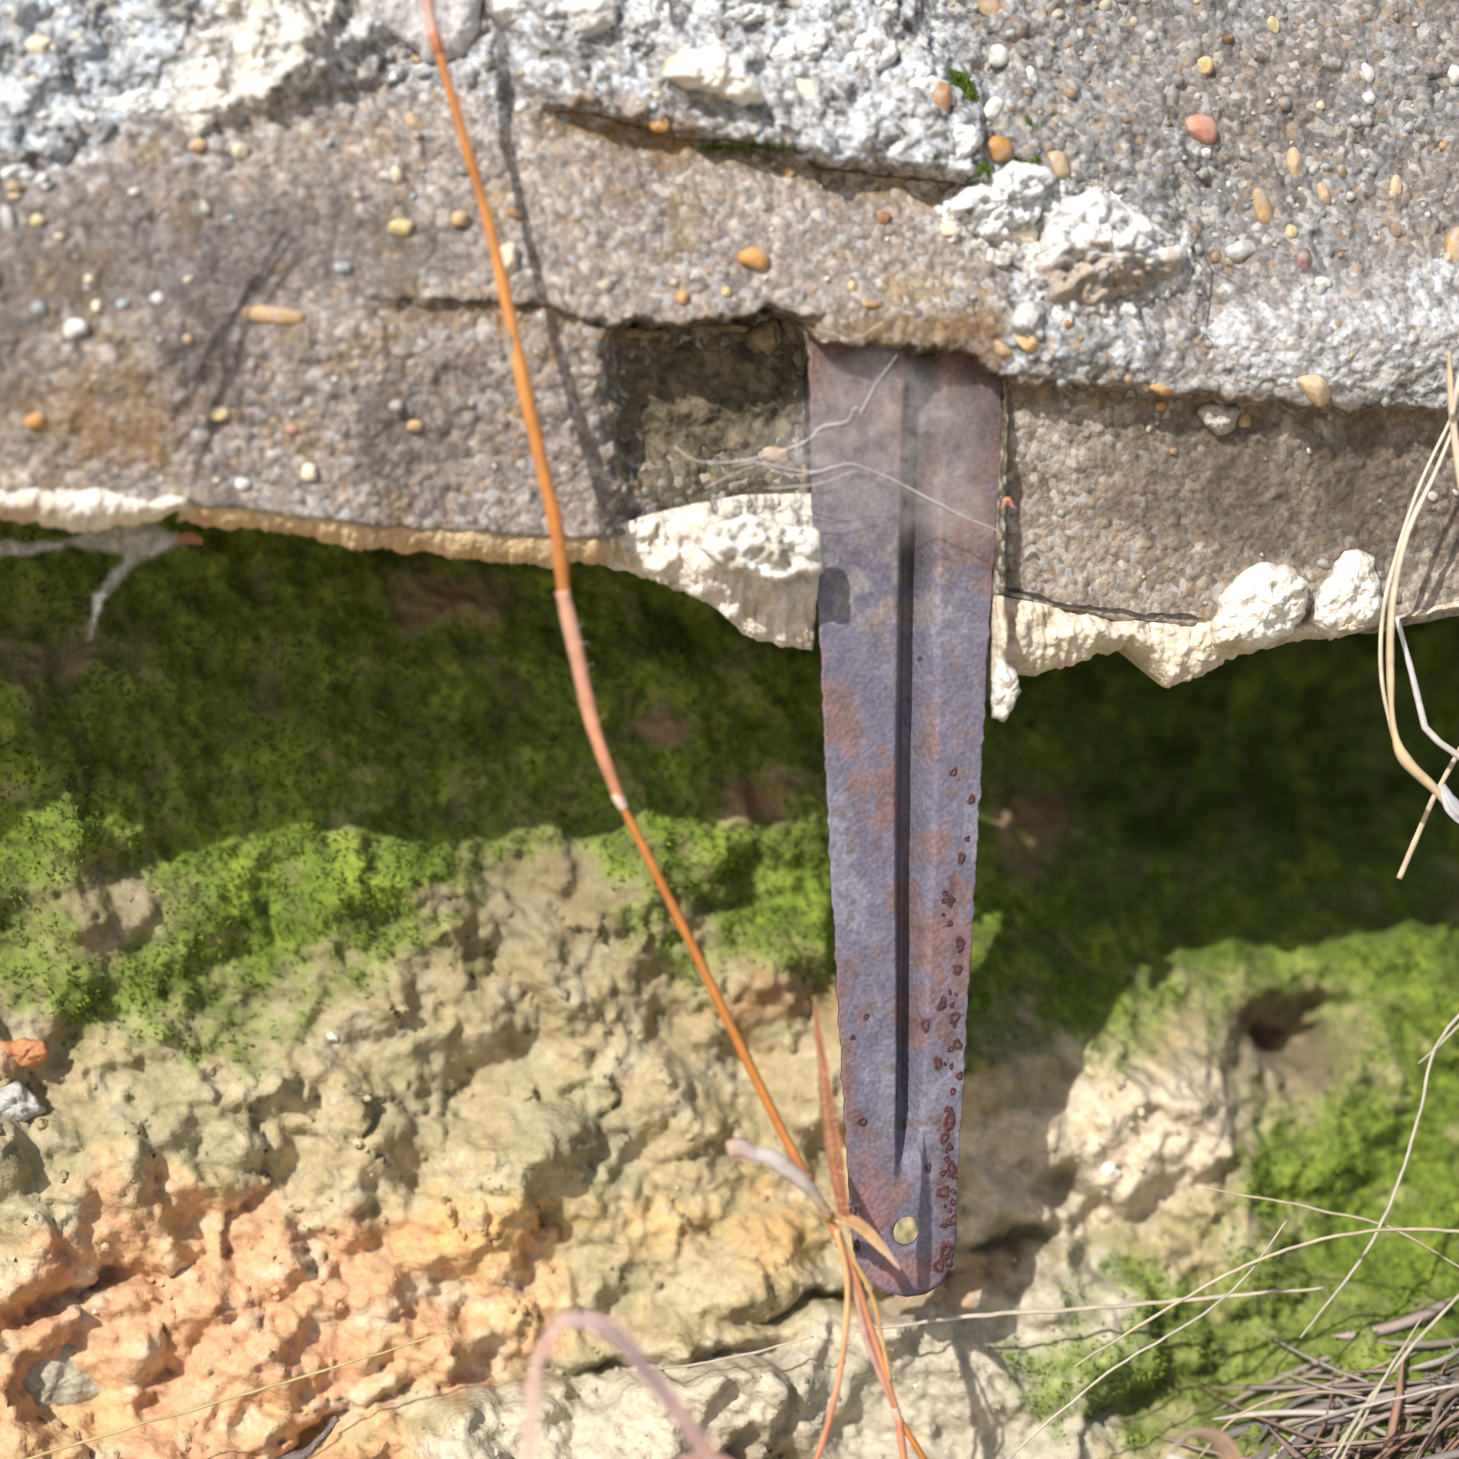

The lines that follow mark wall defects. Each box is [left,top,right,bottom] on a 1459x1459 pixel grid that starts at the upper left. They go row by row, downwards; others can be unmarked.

crack [376,298,629,329]
spalling [617,313,824,489]
crack [1006,588,1202,632]
corrosion [957,835,970,865]
corrosion [920,889,966,1275]
corrosion [855,1116,868,1127]